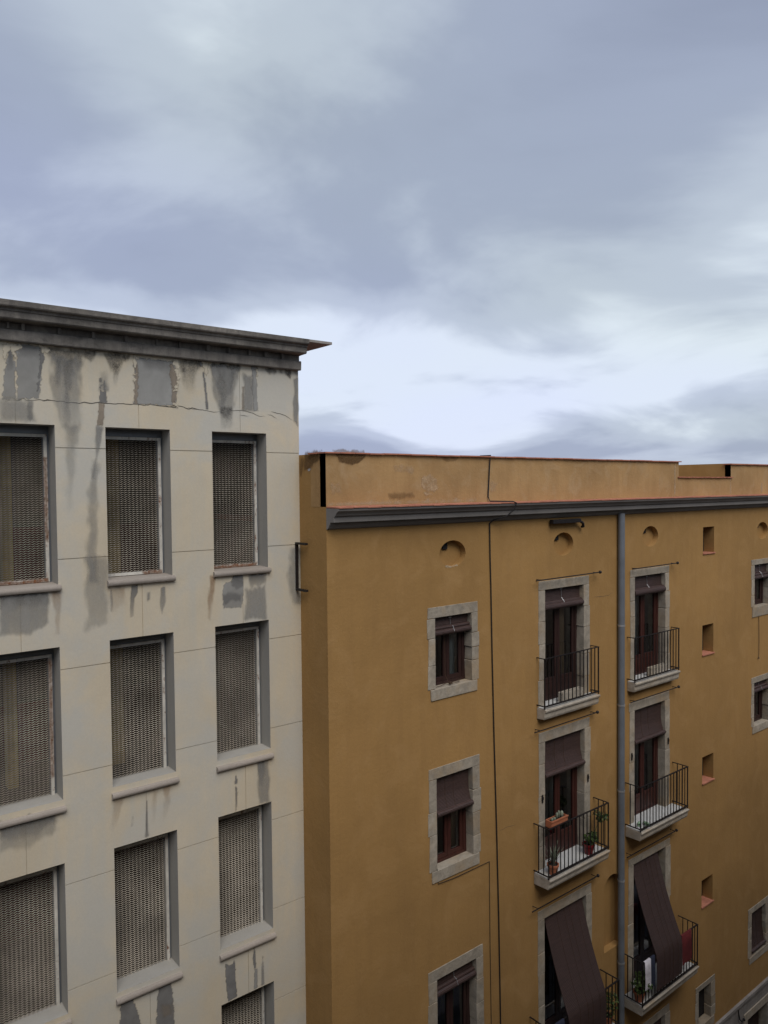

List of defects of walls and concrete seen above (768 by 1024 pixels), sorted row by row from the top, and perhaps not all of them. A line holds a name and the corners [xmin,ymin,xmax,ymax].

peeling [2,342,50,400]
peeling [133,354,180,407]
crack [8,398,289,419]
peeling [223,575,243,608]
peeling [225,962,237,1001]
peeling [120,1000,141,1024]
peeling [156,983,175,1024]